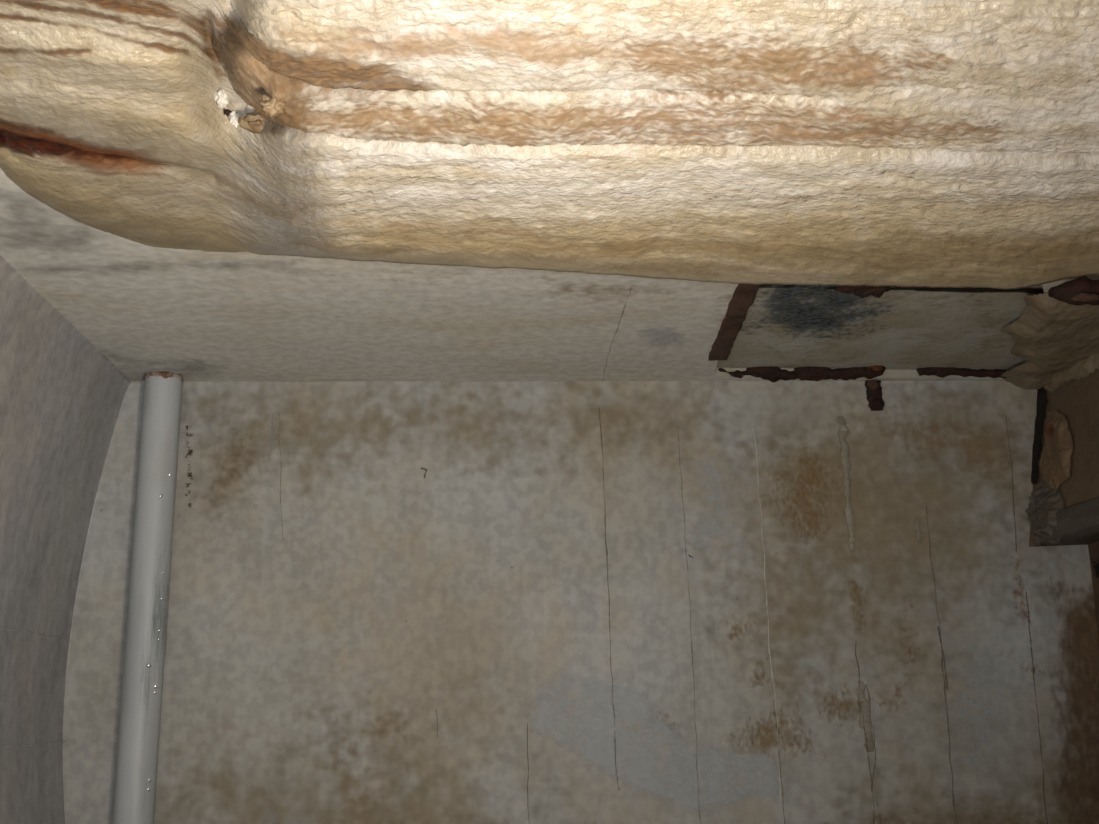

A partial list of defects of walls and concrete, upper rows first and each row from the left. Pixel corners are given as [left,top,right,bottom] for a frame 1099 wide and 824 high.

water stain [0,0,993,146]
corrosion [0,122,167,169]
corrosion [708,284,886,383]
water stain [742,284,890,339]
corrosion [917,367,1009,378]
corrosion [1048,276,1099,306]
crack [599,409,619,790]
crack [753,429,781,805]
water stain [1062,593,1099,824]